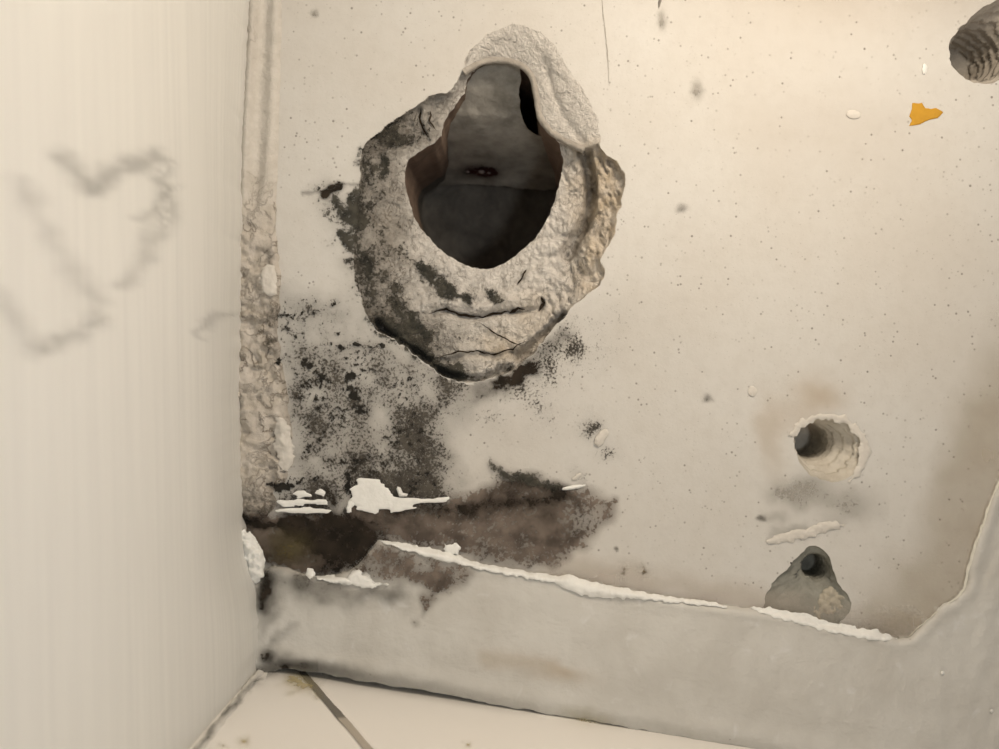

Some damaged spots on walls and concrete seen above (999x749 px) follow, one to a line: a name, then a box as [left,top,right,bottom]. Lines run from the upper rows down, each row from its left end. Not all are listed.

leakage [242,111,619,611]
spalling [353,24,626,383]
spalling [789,413,872,483]